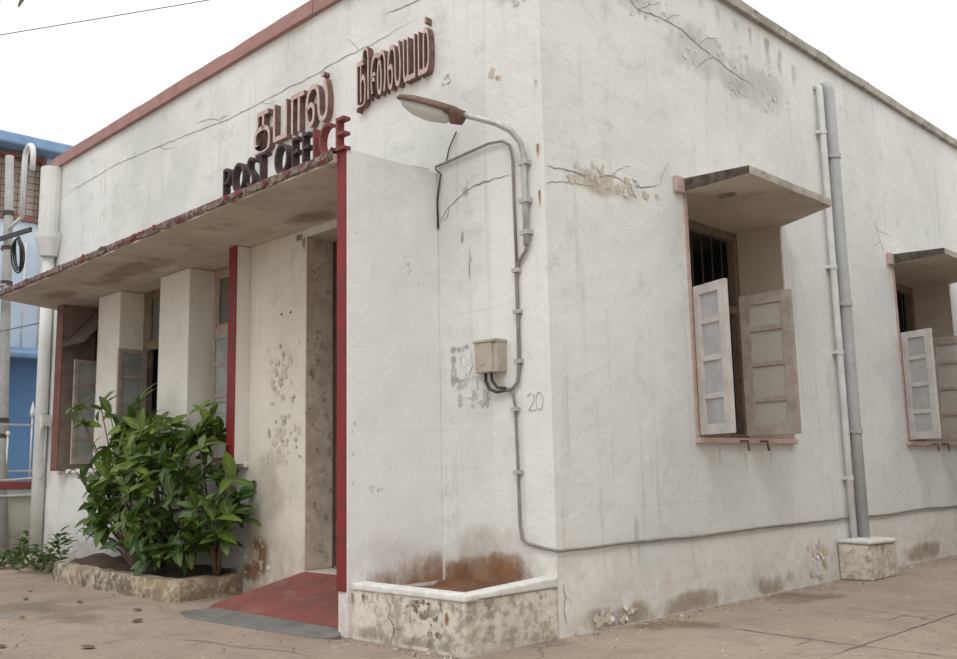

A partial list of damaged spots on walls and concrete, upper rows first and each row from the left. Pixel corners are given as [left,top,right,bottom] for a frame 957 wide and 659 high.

crack [631,1,744,80]
crack [67,0,418,194]
crack [439,174,512,225]
peeling [567,160,659,201]
peeling [450,343,490,409]
peeling [265,344,303,465]
peeling [244,536,271,581]
leakage [405,560,443,585]
peeling [573,606,638,634]